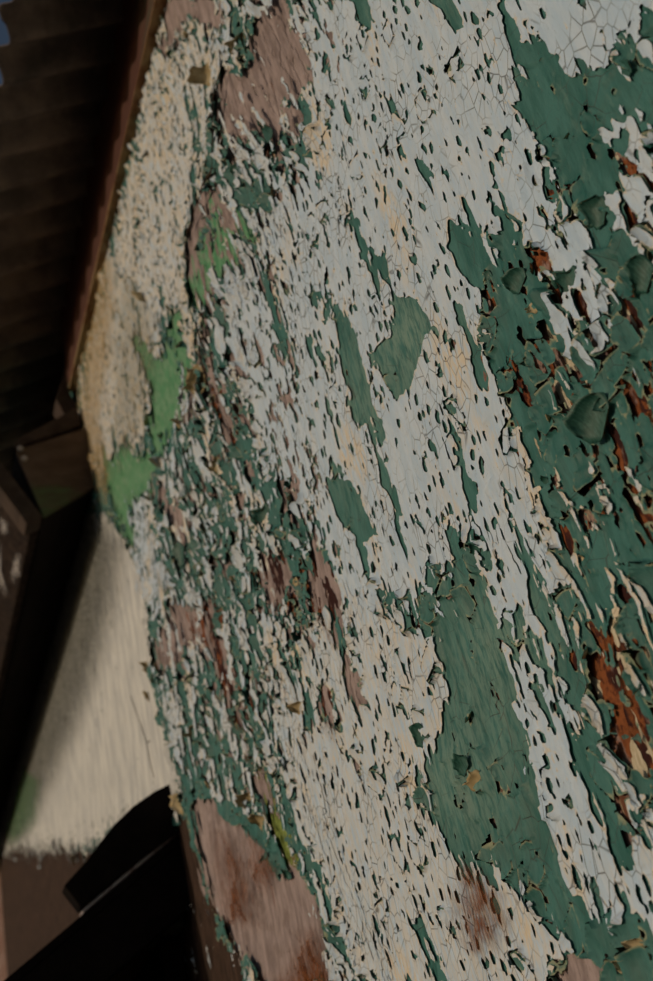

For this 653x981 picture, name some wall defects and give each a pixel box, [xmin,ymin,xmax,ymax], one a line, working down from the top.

peeling [505,0,653,81]
peeling [598,116,653,182]
peeling [576,172,653,259]
peeling [548,371,572,416]
peeling [551,442,612,548]
peeling [624,464,643,511]
peeling [552,602,569,647]
peeling [569,612,582,648]
peeling [595,539,653,696]
peeling [200,692,215,735]
peeling [452,753,482,792]
peeling [501,642,653,936]